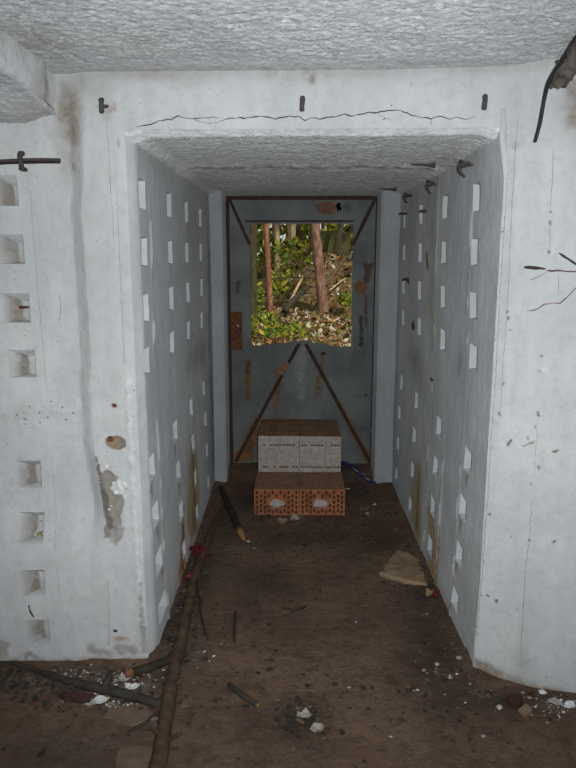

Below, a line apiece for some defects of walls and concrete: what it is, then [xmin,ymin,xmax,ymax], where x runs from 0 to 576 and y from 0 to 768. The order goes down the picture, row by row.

leakage [53,76,87,177]
crack [138,110,475,127]
peeling [84,337,148,659]